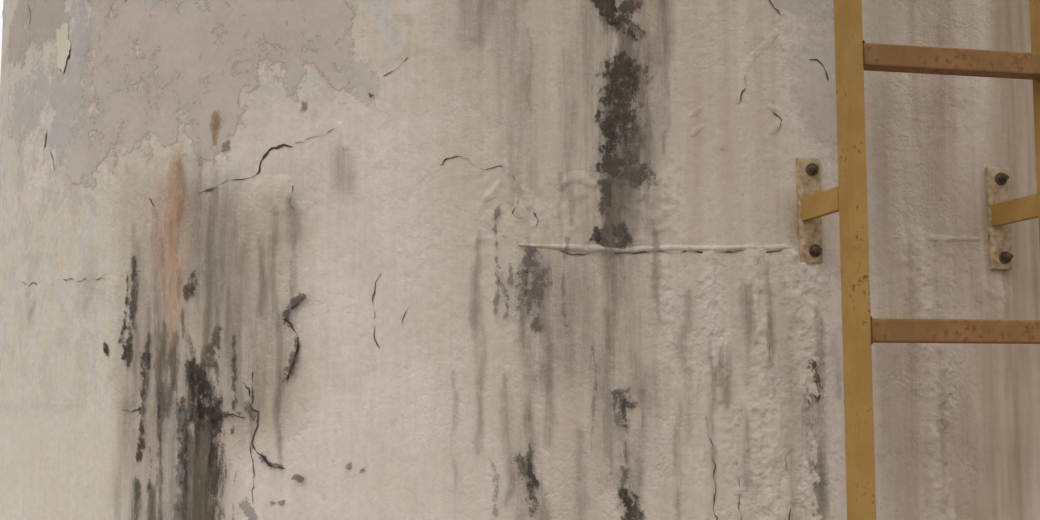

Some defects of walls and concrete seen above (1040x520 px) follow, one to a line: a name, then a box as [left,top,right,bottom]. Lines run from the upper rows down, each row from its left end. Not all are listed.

leakage [592,0,646,40]
peeling [2,0,358,189]
rust [211,111,219,144]
crack [197,128,335,195]
leakage [589,51,656,254]
leakage [516,247,552,333]
crack [278,293,307,382]
leakage [103,256,240,520]
crack [204,372,304,502]
mould [611,388,637,412]
leakage [506,444,547,520]
leakage [618,466,646,520]